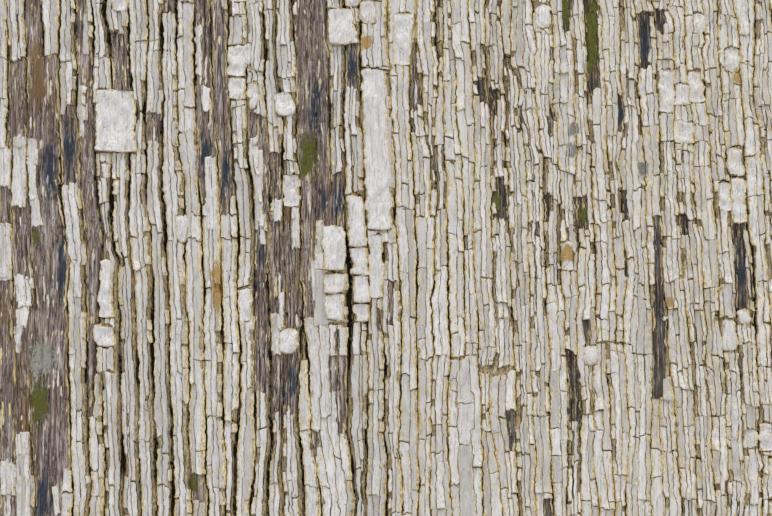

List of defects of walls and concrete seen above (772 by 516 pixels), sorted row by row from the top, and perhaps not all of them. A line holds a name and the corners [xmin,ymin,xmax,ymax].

crack [0,0,37,328]
crack [40,0,88,251]
peeling [0,0,536,516]
crack [310,0,772,516]
crack [0,357,36,516]